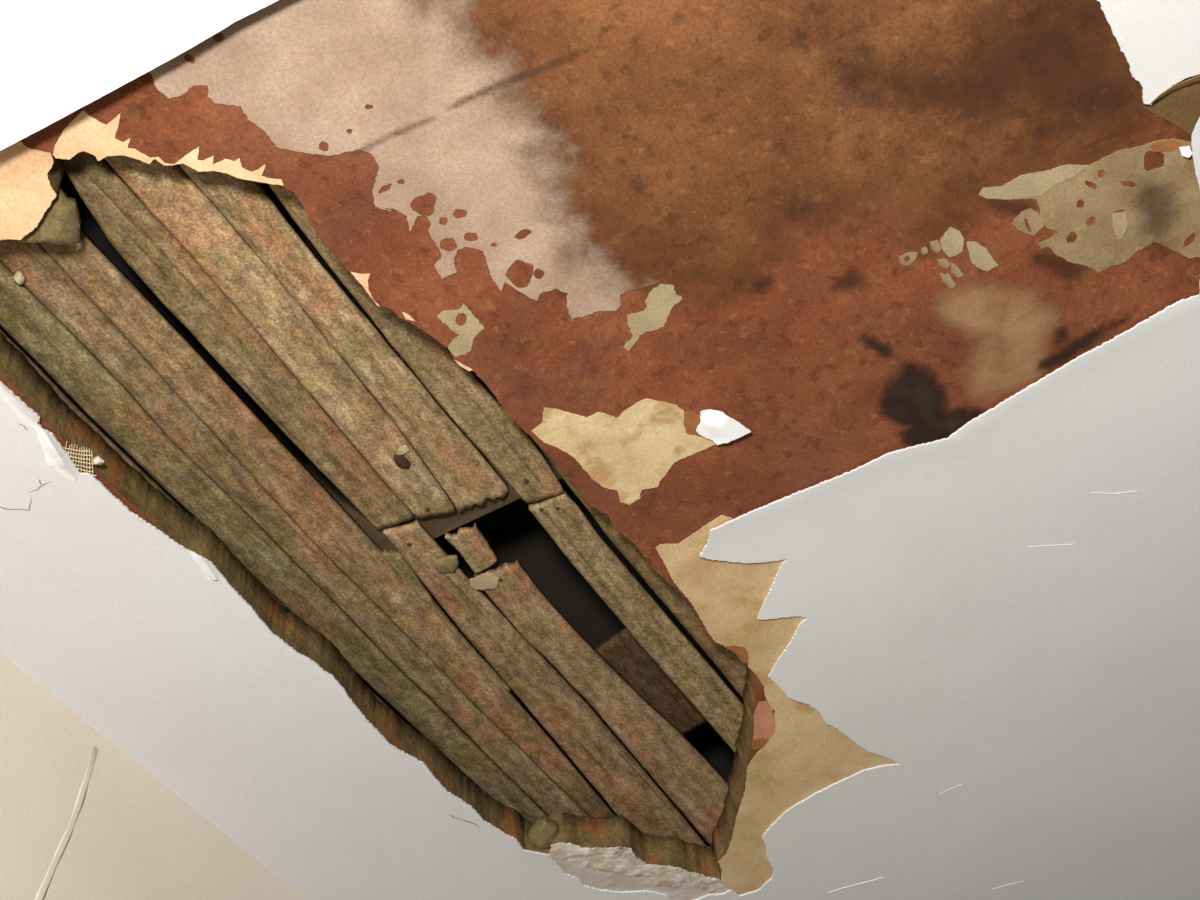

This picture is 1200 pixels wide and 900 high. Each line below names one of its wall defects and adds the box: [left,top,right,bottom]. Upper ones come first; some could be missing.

damp [417,0,1136,284]
crack [0,480,53,511]
flaking render [0,332,775,900]
flaking render [4,0,1200,647]
damp [884,370,980,444]
damp [954,291,1047,367]